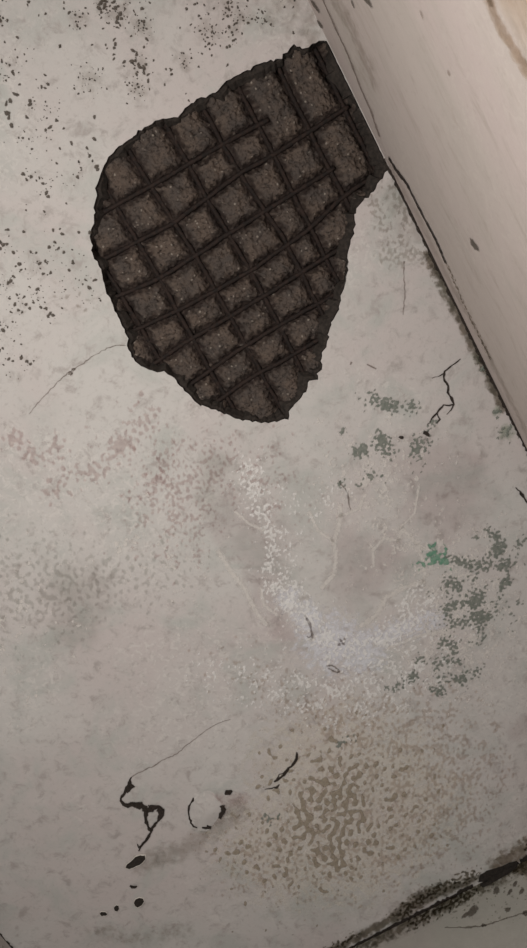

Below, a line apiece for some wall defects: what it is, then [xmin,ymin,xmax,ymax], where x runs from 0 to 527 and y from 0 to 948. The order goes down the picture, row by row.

spalling [90,41,388,423]
crack [384,157,527,452]
leakage [425,253,500,405]
leakage [193,426,527,744]
crack [120,777,165,851]
crack [265,752,298,790]
mould [333,863,524,948]